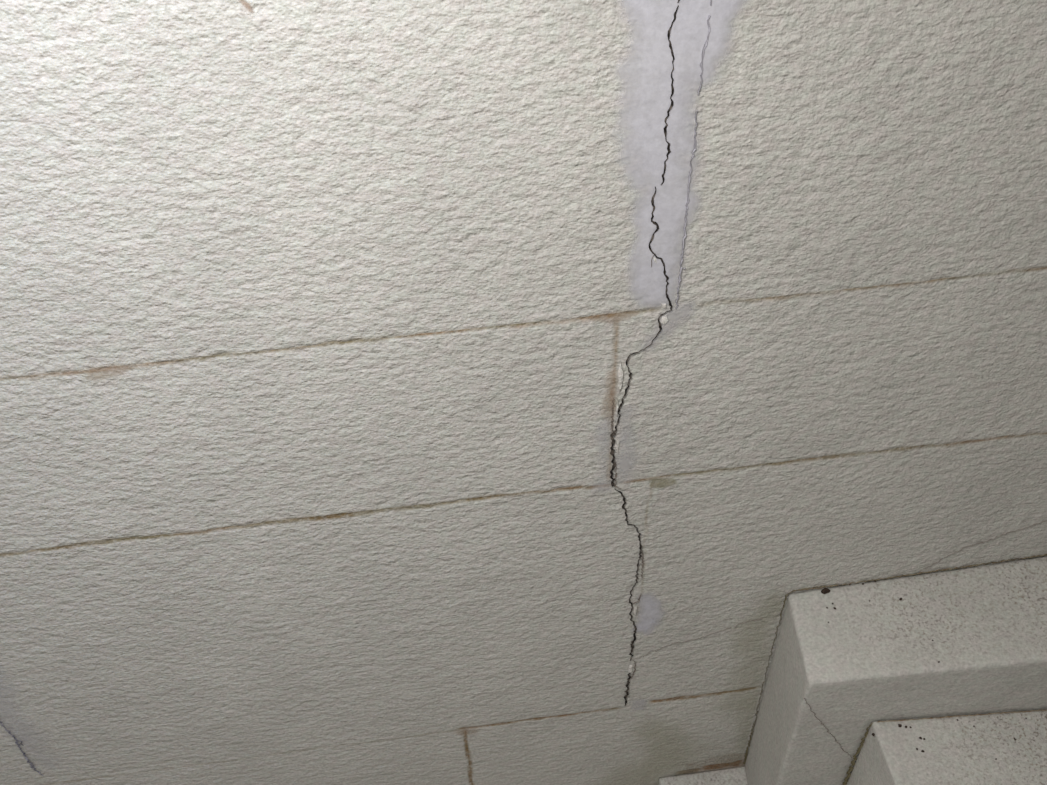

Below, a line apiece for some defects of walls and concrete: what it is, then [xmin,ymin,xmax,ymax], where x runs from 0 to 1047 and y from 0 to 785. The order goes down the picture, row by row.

crack [610,0,762,706]
crack [0,721,43,776]